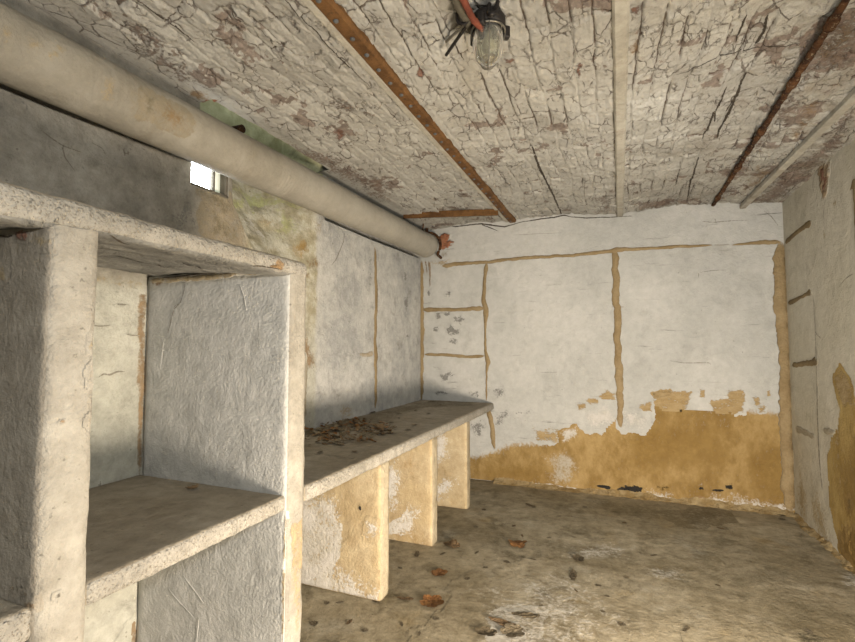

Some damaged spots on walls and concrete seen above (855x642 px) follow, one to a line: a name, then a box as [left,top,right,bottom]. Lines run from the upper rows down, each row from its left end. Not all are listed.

crack [137,0,194,42]
crack [285,0,371,88]
crack [431,0,465,61]
crack [675,13,798,202]
rust [403,209,498,219]
crack [451,145,628,235]
peeling [576,388,617,411]
peeling [636,388,772,417]
spalling [838,492,855,569]